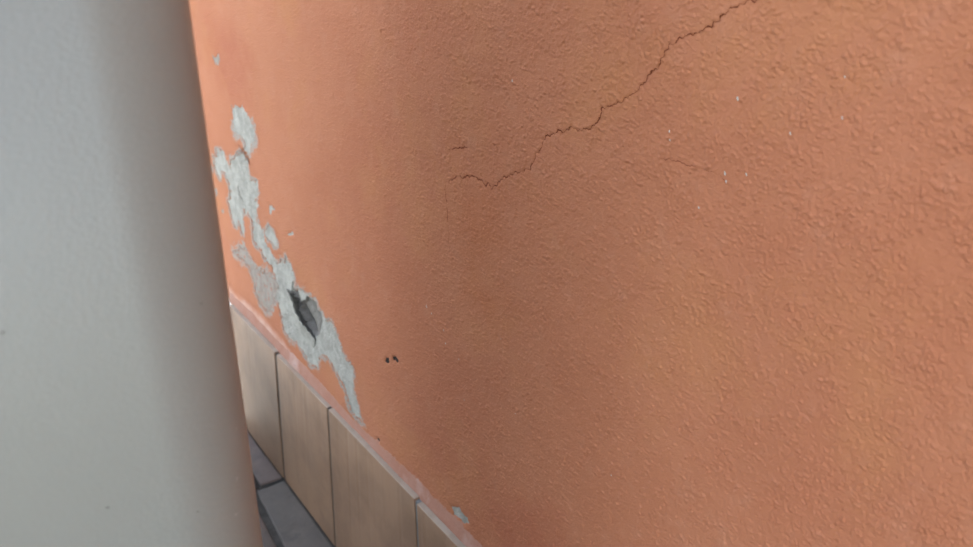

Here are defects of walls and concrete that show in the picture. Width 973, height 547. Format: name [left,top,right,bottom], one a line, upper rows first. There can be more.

spalling [210,105,380,442]
crack [444,0,757,242]